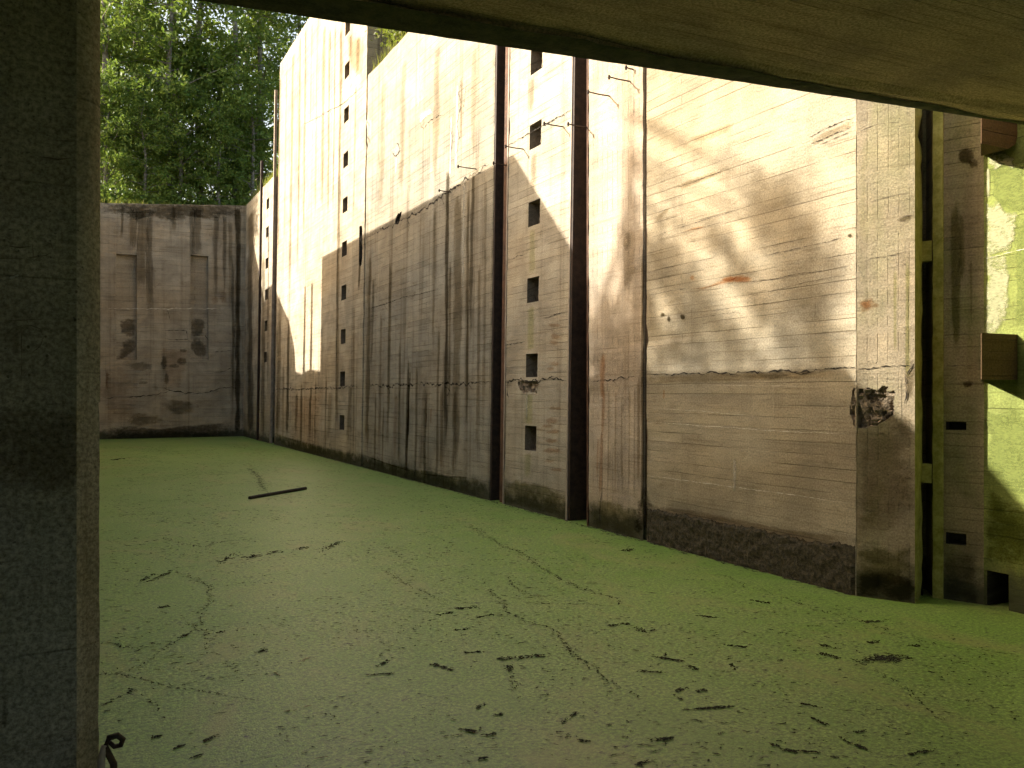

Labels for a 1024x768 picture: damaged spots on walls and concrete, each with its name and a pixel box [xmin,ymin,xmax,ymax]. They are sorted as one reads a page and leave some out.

leakage [111,205,241,430]
crack [591,343,913,385]
crack [282,376,565,396]
spalling [515,377,541,397]
spalling [847,364,914,435]